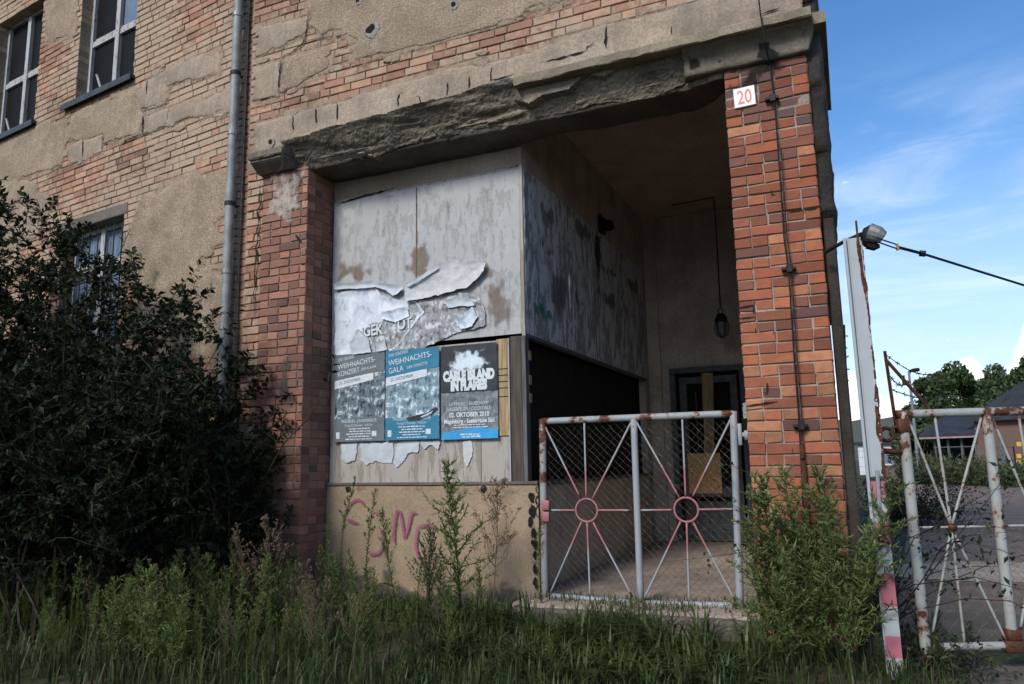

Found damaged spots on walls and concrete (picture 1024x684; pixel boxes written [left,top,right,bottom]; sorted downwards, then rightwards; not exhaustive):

peeling [0,49,223,253]
spalling [251,0,801,168]